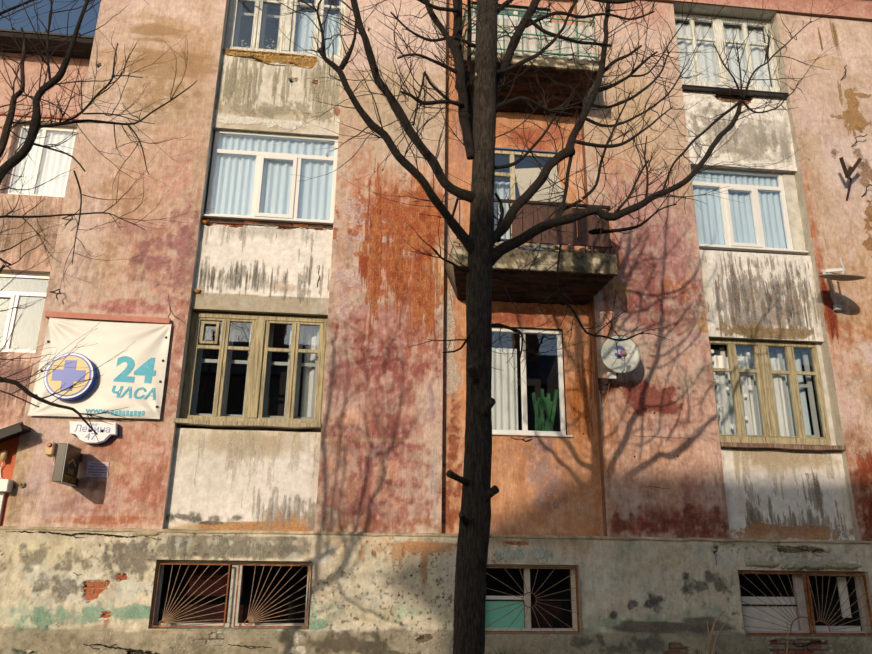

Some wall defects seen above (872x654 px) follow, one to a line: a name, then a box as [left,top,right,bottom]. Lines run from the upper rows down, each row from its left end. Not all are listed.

leakage [127,51,340,121]
flaking render [222,48,319,84]
flaking render [831,83,871,136]
flaking render [854,149,872,187]
flaking render [862,200,872,251]
leakage [199,261,286,297]
corrosion [348,163,444,345]
leakage [705,251,820,340]
leakage [733,449,848,540]
peeling [79,572,150,622]
crack [83,643,147,652]
flaking render [768,639,833,654]